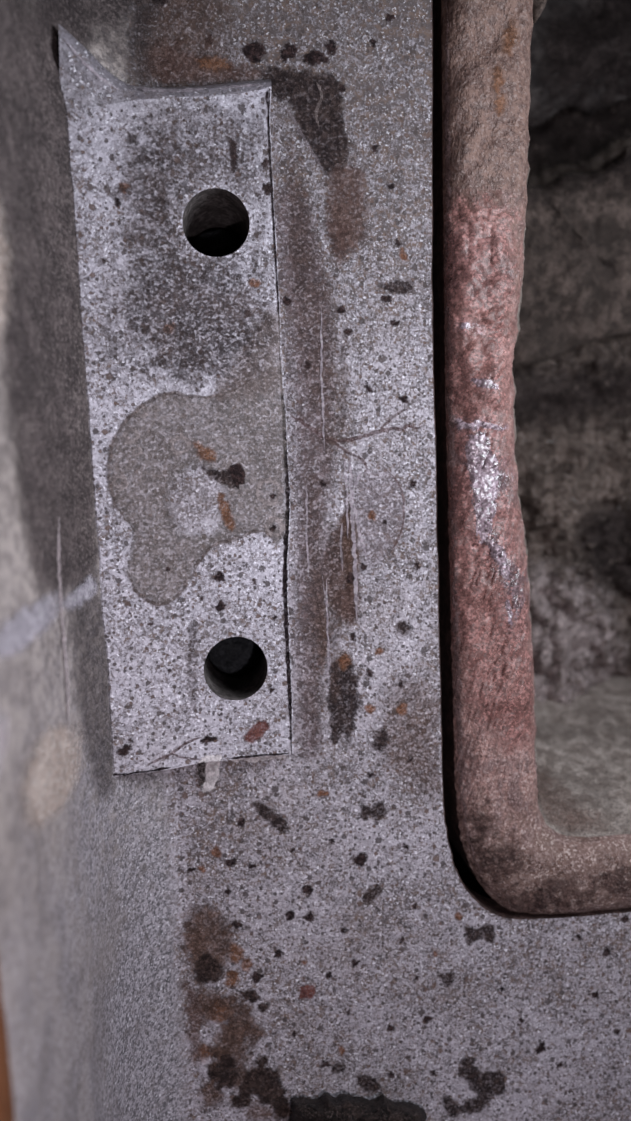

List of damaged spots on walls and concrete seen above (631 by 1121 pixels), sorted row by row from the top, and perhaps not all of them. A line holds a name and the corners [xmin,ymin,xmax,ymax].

rust [313,509,376,744]
rust [182,905,292,1119]